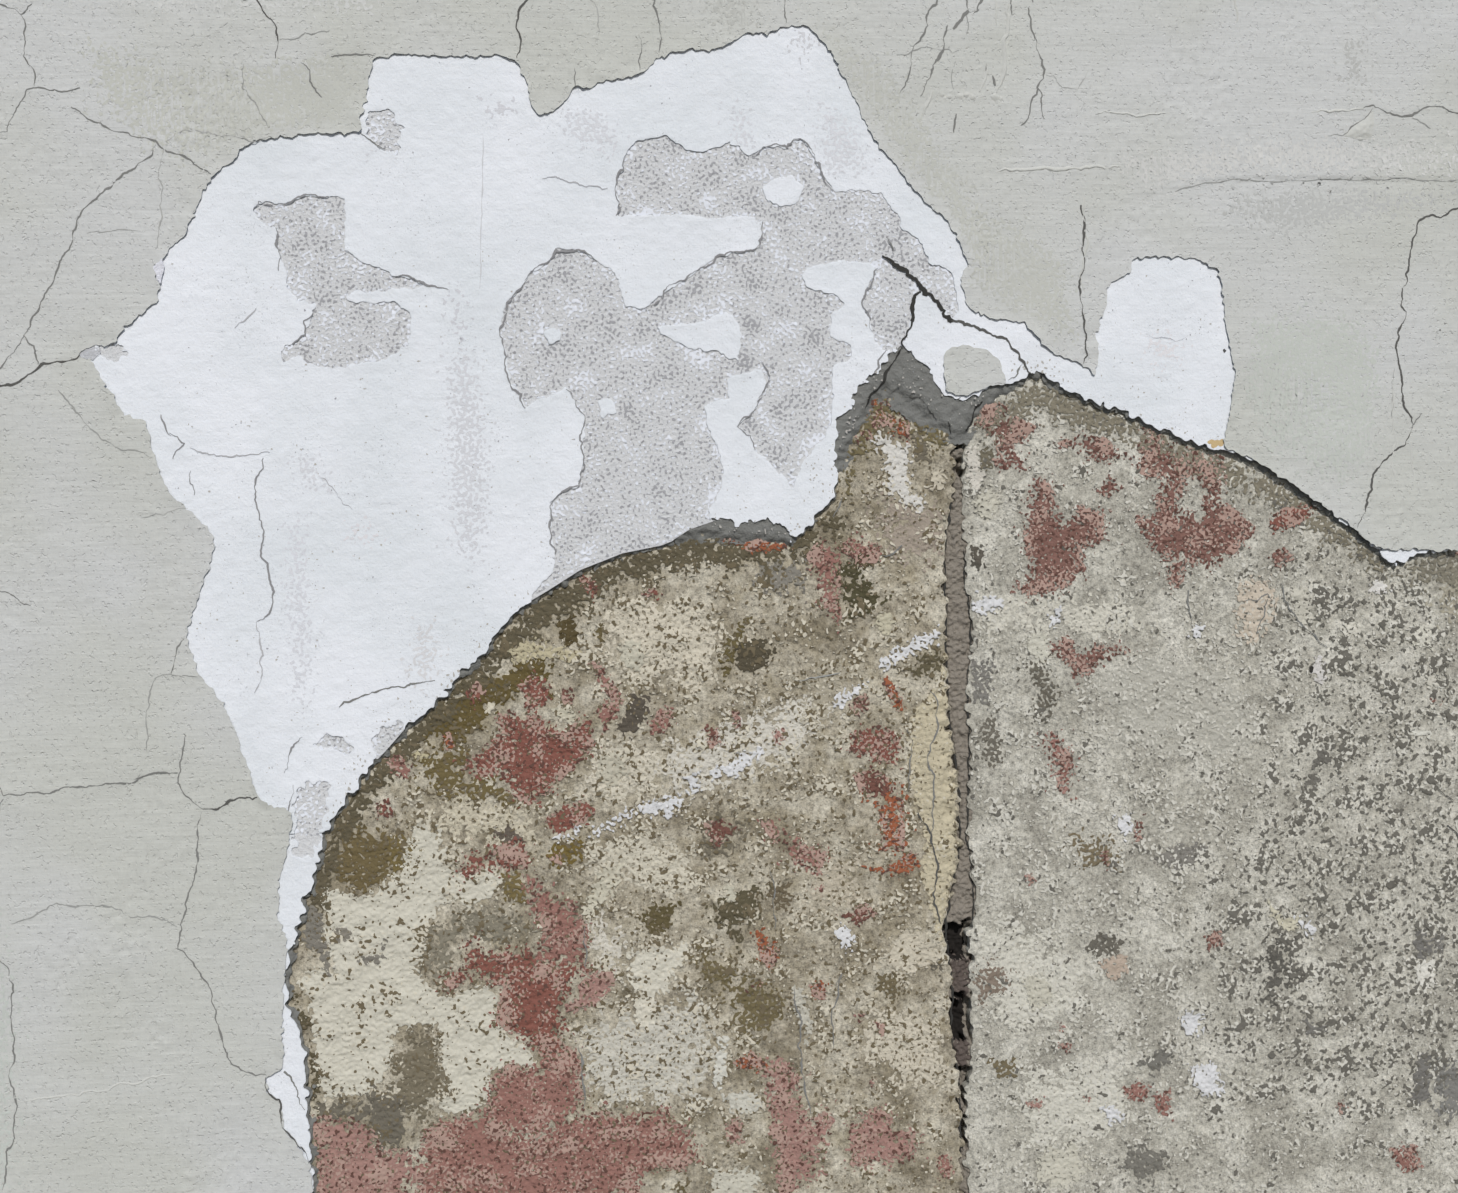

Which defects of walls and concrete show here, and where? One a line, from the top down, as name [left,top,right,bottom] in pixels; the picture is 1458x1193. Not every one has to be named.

crack [515,0,528,58]
crack [638,0,662,66]
crack [1331,105,1458,136]
crack [0,0,375,457]
crack [1078,205,1088,361]
crack [1358,207,1458,525]
peeling [79,25,1253,1189]
crack [1245,583,1328,648]
peeling [1370,544,1449,566]
crack [865,348,983,1152]
crack [0,639,309,1190]
crack [794,974,842,1114]